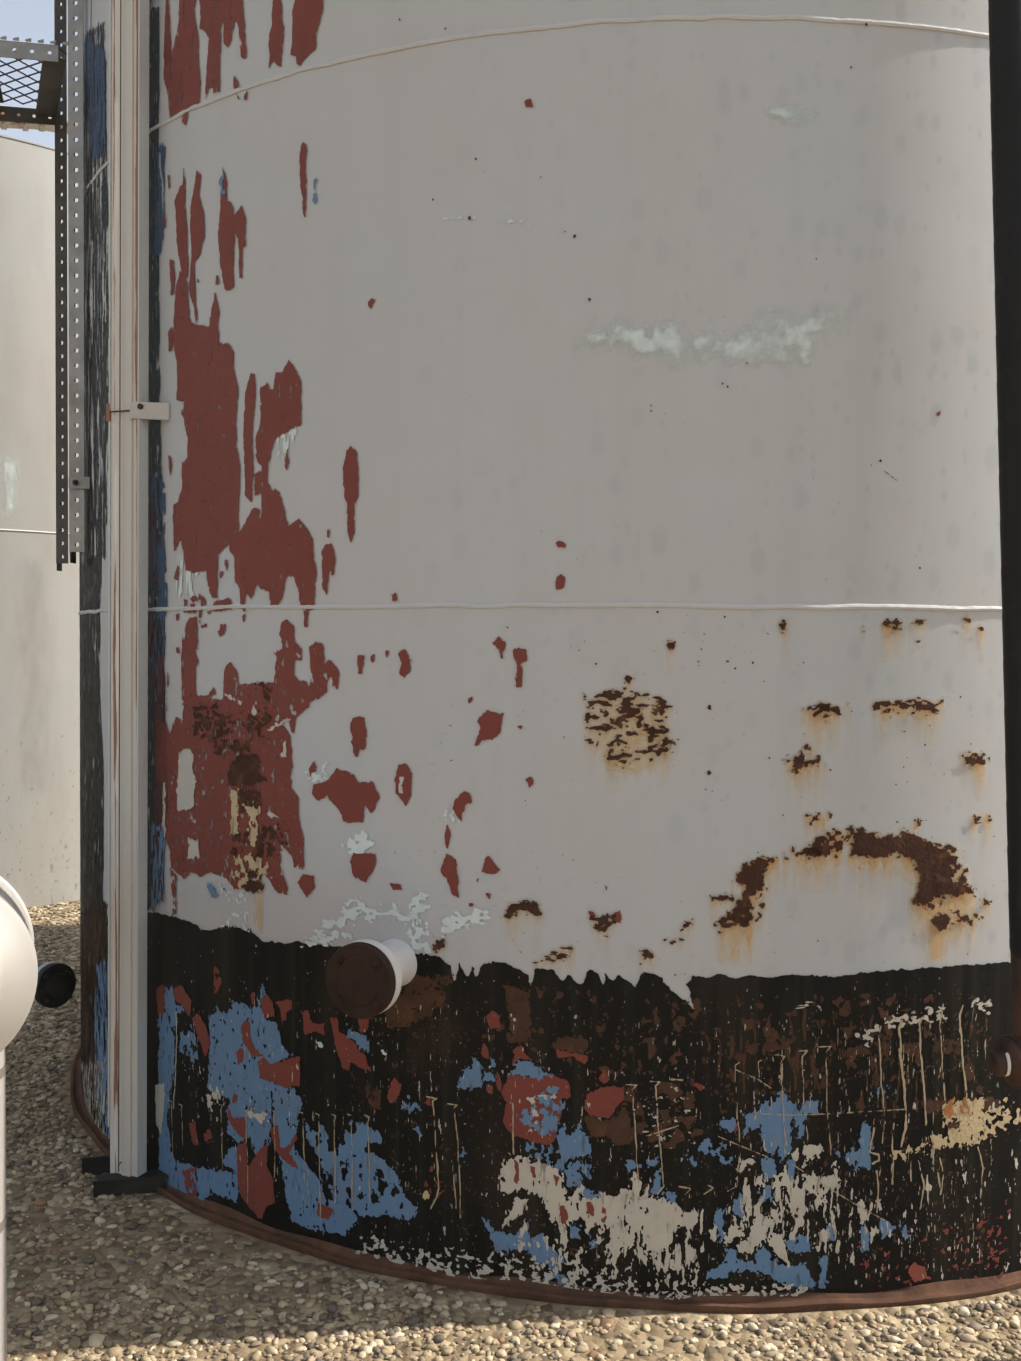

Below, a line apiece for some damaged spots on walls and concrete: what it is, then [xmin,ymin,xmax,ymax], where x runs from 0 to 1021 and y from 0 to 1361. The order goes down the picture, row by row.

damp [586,313,831,364]
peeling [147,0,380,932]
peeling [357,649,411,678]
rust [568,674,679,771]
rust [768,684,972,775]
peeling [394,763,412,806]
rust [961,743,990,779]
rust [639,811,1005,965]
peeling [300,929,354,948]
rust [520,933,578,964]
peeling [155,966,1021,1291]